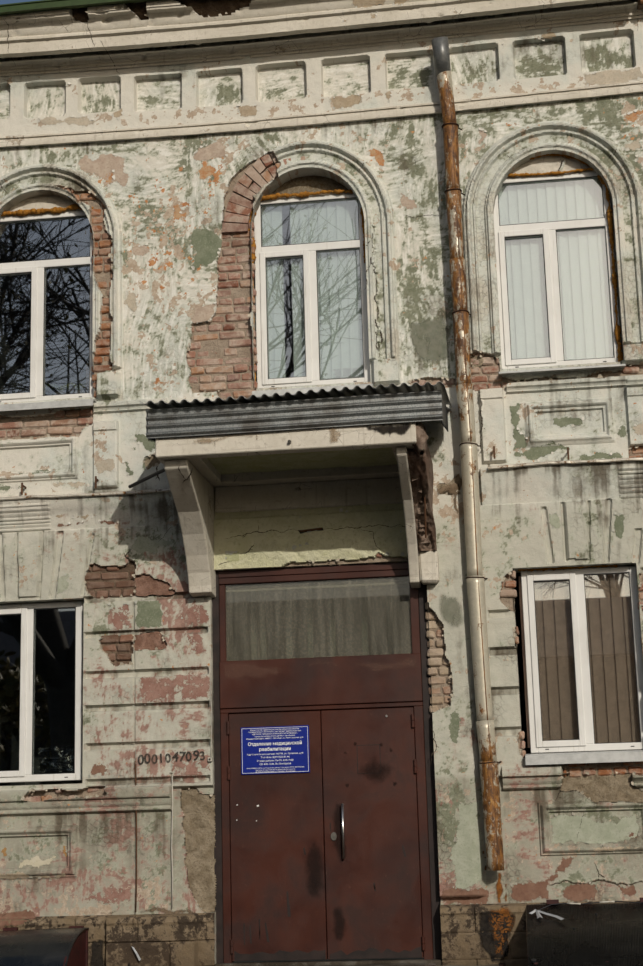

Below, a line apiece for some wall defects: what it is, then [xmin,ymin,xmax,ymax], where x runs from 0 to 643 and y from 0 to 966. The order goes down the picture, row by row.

spalling [72,7,89,23]
spalling [125,2,149,20]
spalling [176,0,253,18]
peeling [178,142,228,182]
spalling [0,186,113,440]
spalling [186,153,305,400]
crack [219,525,298,565]
spalling [85,561,175,666]
spalling [425,602,462,743]
spalling [170,747,216,913]
corrosion [490,873,514,953]
crack [550,864,643,886]